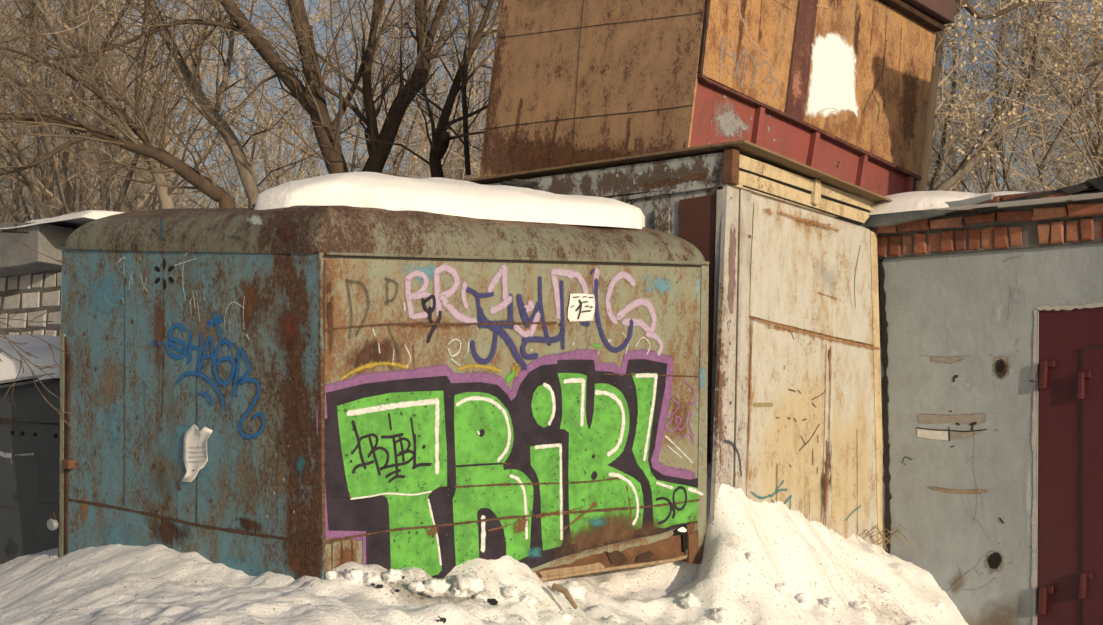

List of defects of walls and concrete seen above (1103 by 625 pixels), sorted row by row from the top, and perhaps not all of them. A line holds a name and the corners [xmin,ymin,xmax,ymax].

rust [737,0,746,63]
rust [854,7,874,58]
rust [484,50,499,161]
rust [792,70,802,105]
rust [898,27,917,151]
rust [508,99,631,173]
rust [766,209,839,231]
rust [236,281,262,329]
rust [155,306,165,363]
rust [746,317,880,526]
rust [154,518,187,546]
rust [232,518,260,533]